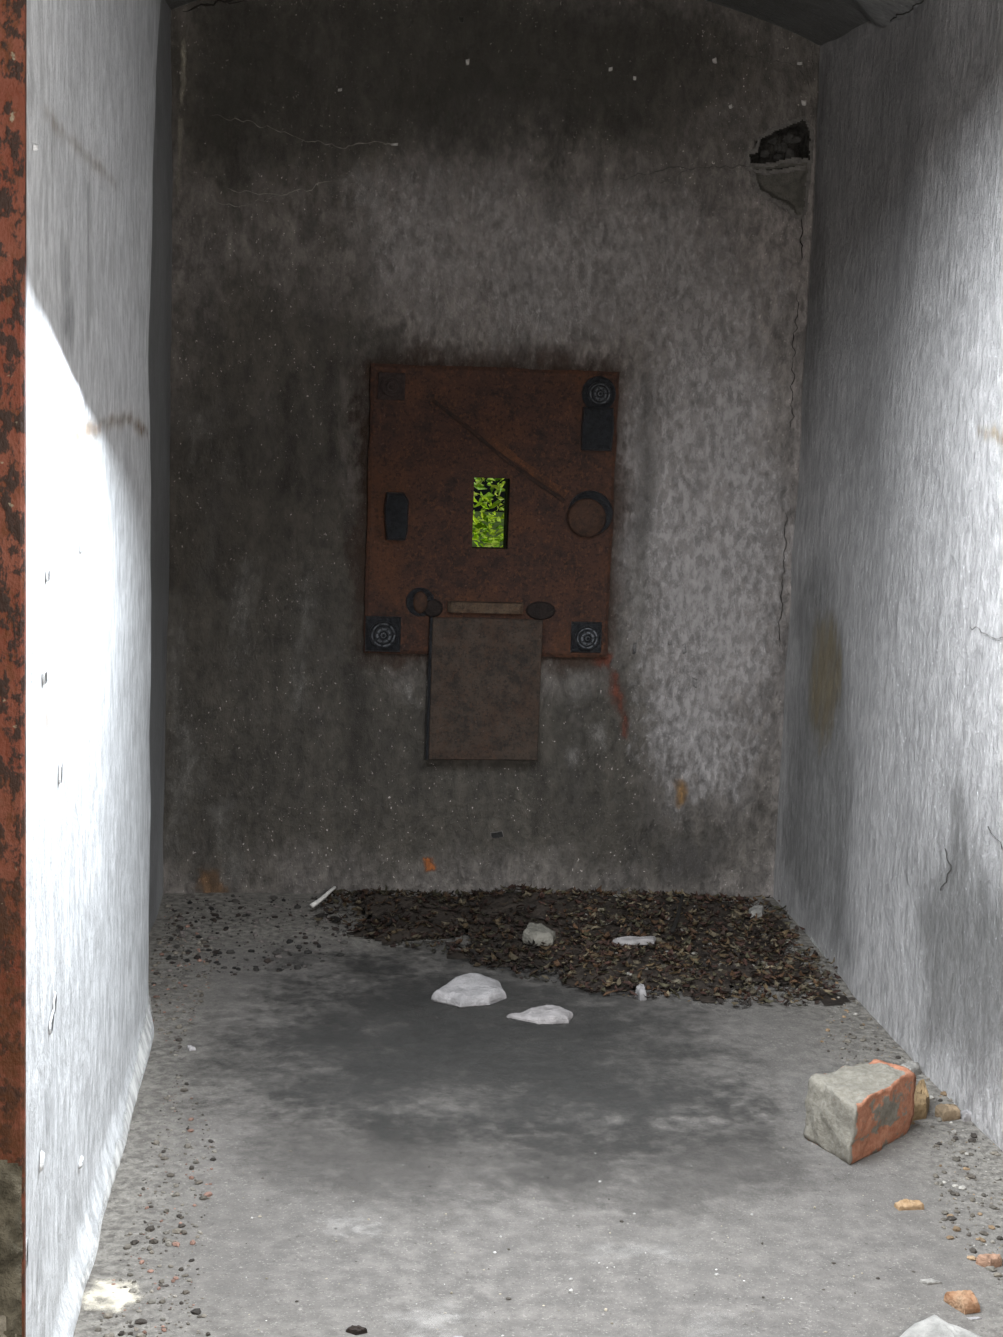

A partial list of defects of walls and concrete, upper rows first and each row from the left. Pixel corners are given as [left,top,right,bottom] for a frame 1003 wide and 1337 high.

spalling [745,100,814,220]
crack [940,848,952,890]